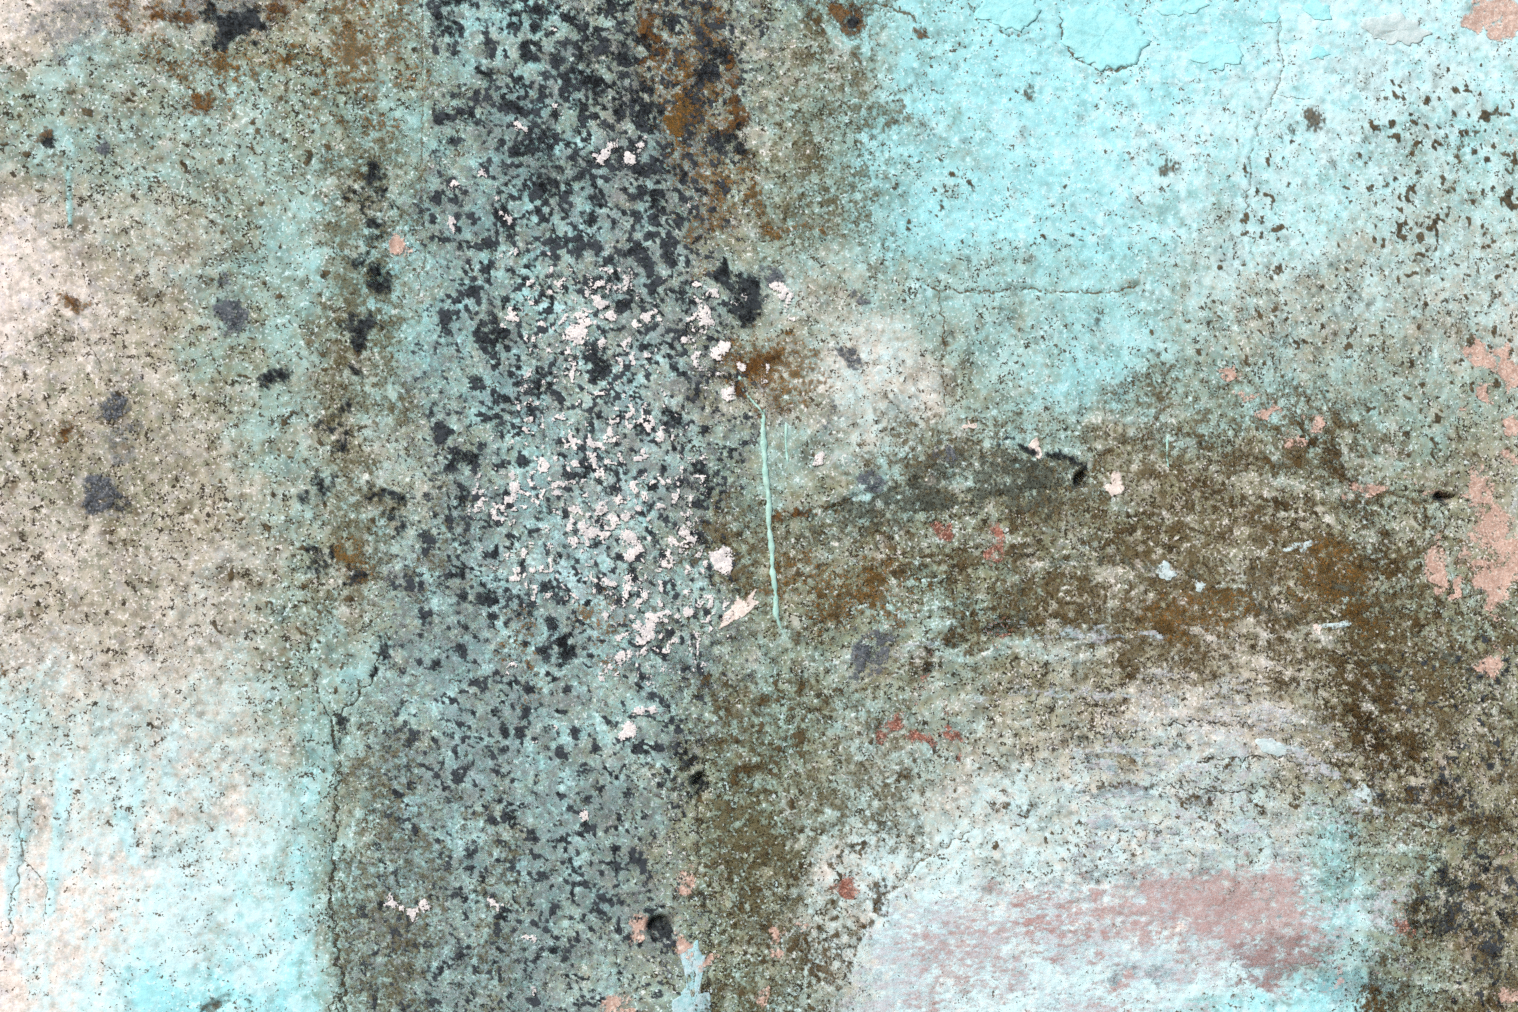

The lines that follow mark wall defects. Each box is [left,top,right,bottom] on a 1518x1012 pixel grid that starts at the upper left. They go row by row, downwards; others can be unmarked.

crack [968,3,1129,73]
peeling [1060,5,1152,72]
corrosion [633,0,931,280]
damp [1285,107,1325,134]
damp [835,346,862,370]
flaking render [1404,464,1518,621]
peeling [719,589,760,629]
damp [368,631,413,686]
flaking render [1473,645,1504,678]
crack [312,644,381,1012]
damp [839,875,1283,1012]
damp [1354,979,1418,1012]